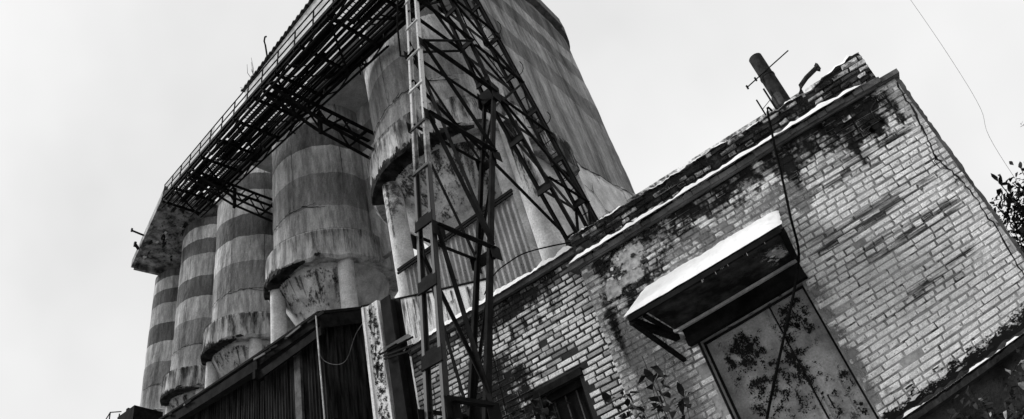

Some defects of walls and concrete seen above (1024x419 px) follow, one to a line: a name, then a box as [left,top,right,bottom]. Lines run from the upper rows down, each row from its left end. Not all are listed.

leakage [576,63,909,419]
spalling [263,252,321,300]
spalling [200,334,244,366]